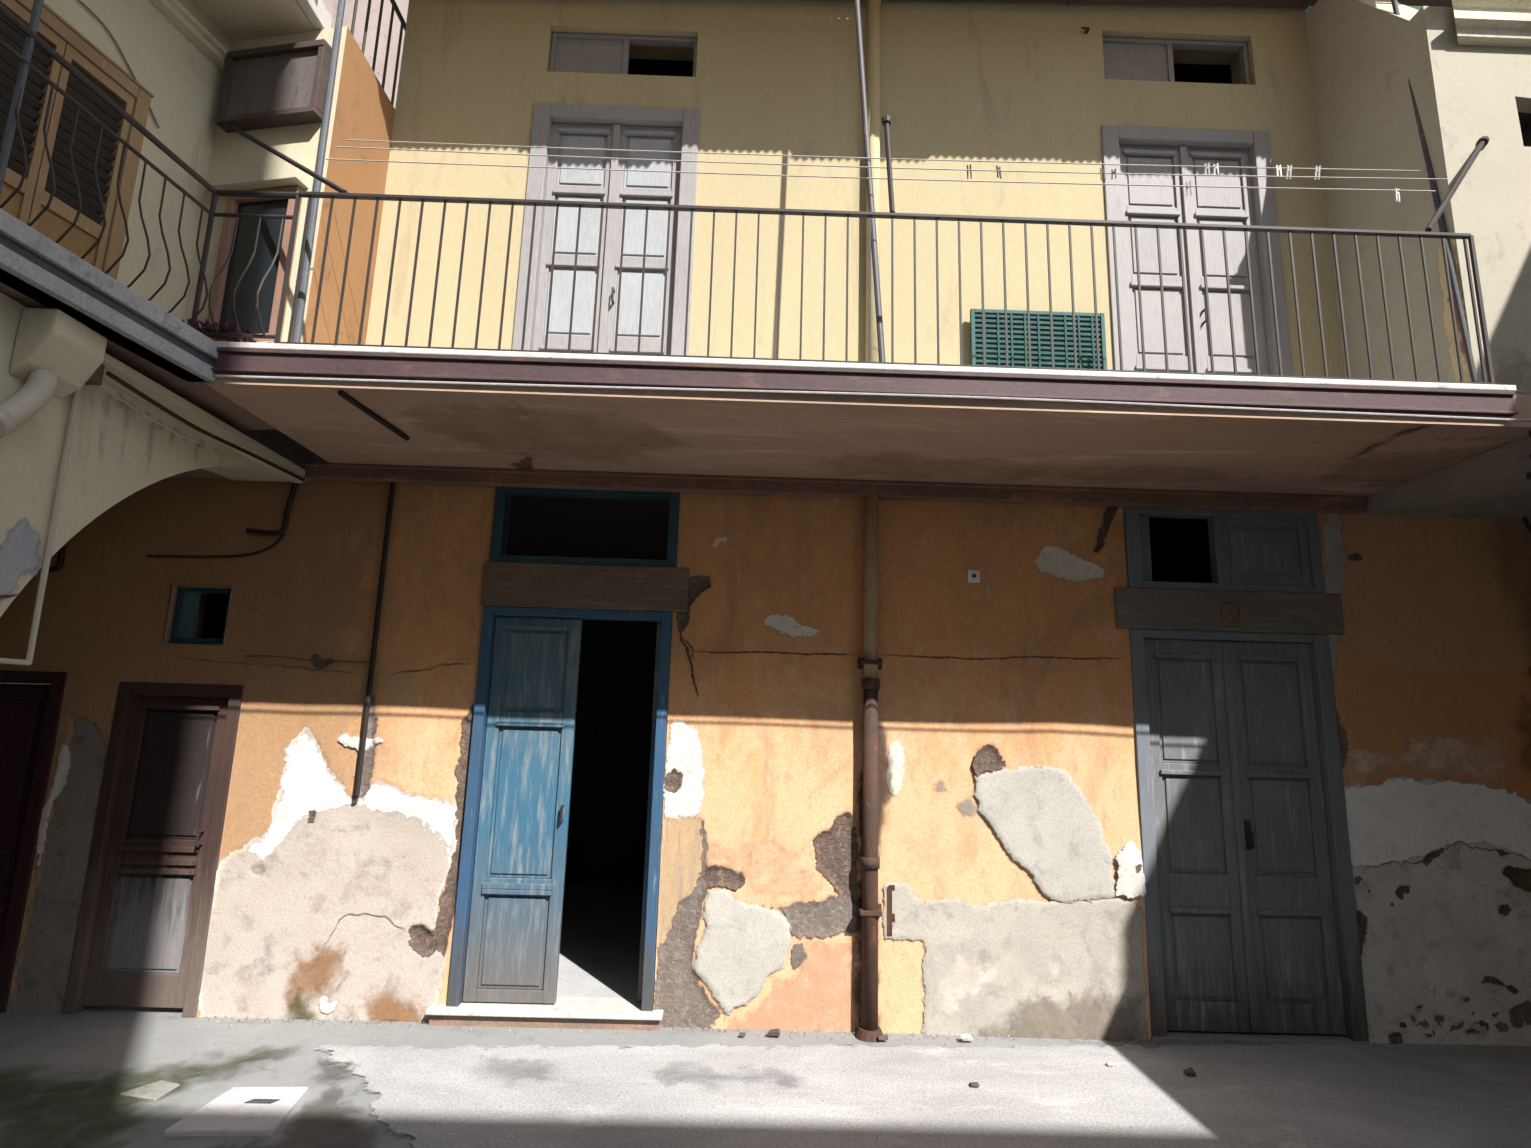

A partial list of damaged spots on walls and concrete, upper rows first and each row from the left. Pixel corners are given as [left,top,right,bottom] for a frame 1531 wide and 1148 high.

peeling [0,519,40,600]
peeling [1034,506,1118,582]
crack [174,658,471,675]
peeling [764,614,821,638]
crack [678,628,1125,698]
spalling [664,768,683,793]
peeling [888,739,905,796]
flaking render [9,712,108,1013]
flaking render [198,695,475,1022]
flaking render [1336,709,1531,1046]
peeling [653,812,860,1036]
corrosion [287,948,341,1000]